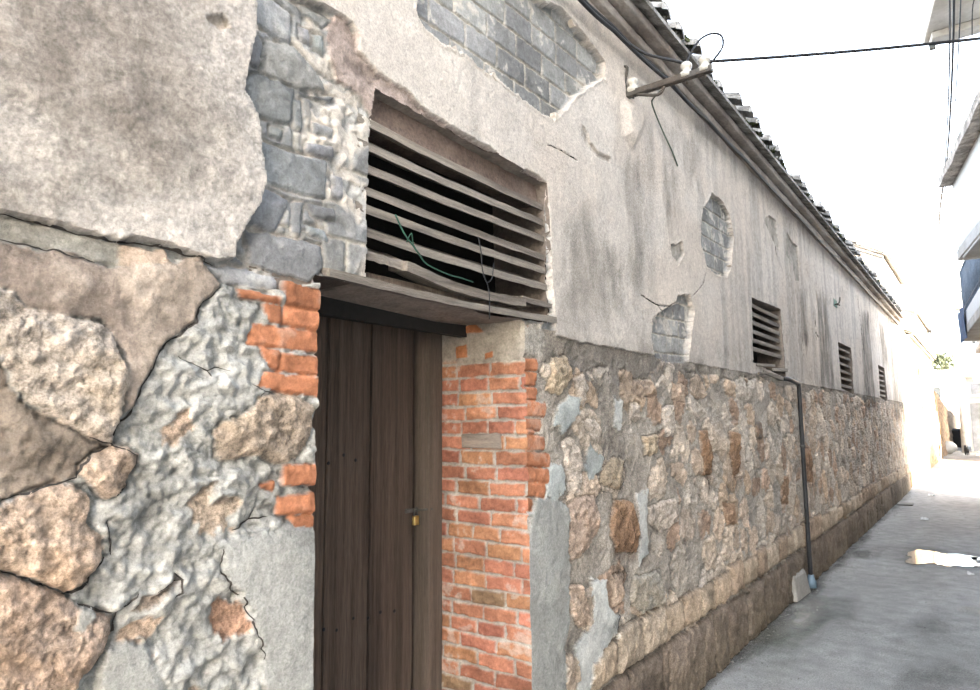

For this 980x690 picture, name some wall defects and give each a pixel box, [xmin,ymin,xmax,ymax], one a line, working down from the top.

flaking render [413,0,606,123]
flaking render [105,0,491,291]
flaking render [7,211,94,237]
crack [0,214,212,266]
flaking render [522,199,557,331]
flaking render [699,190,734,279]
flaking render [650,291,695,364]
crack [1,287,230,501]
crack [220,510,267,660]